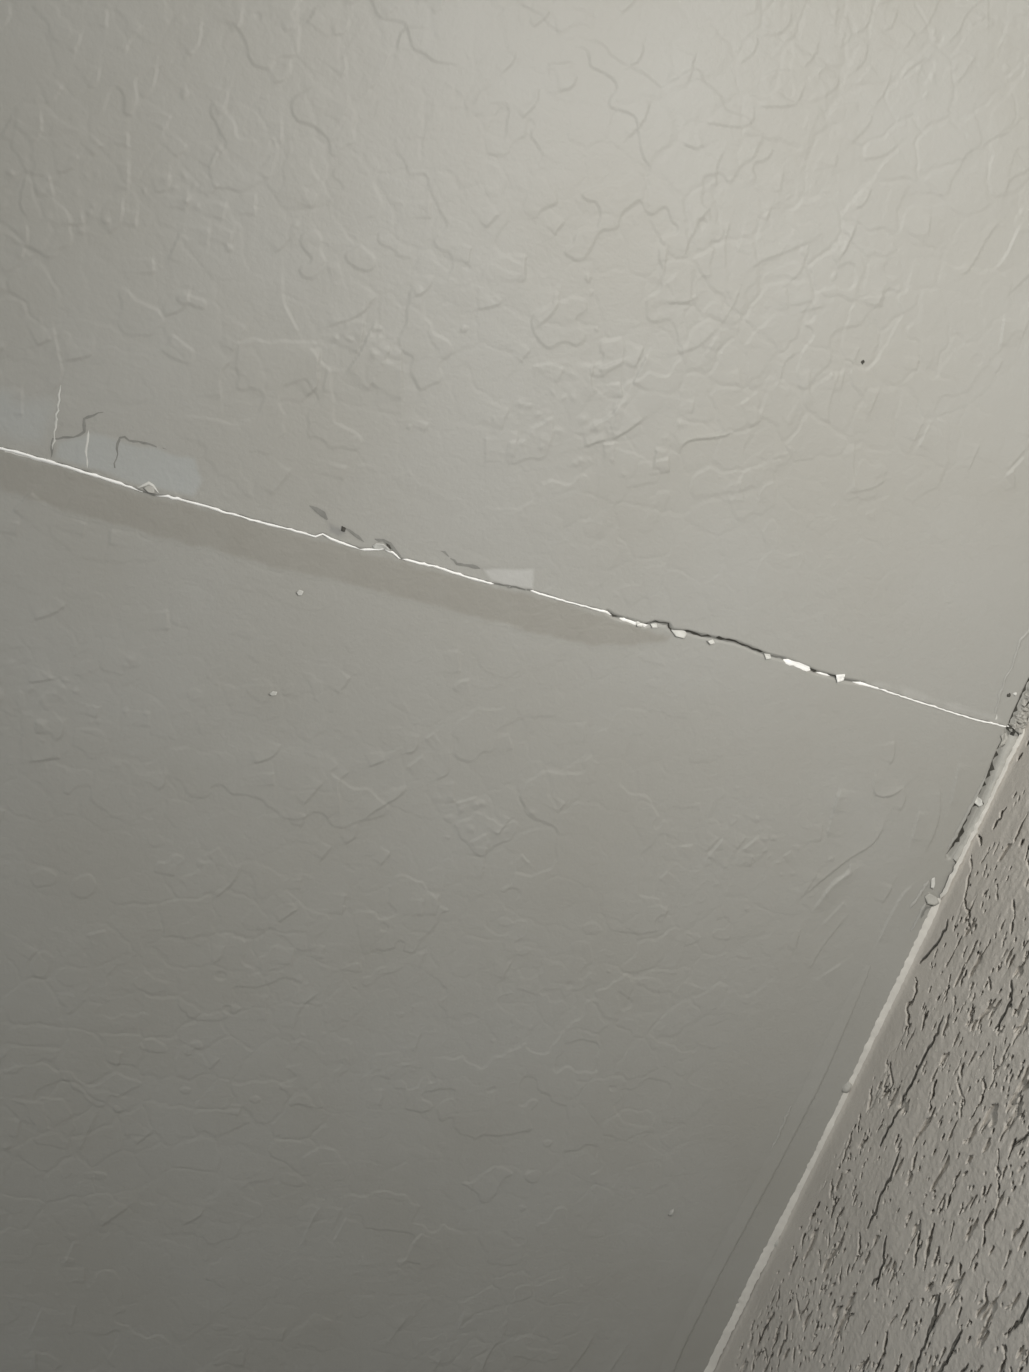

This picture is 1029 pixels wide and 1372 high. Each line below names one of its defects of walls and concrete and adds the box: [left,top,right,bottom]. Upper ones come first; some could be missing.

crack [0,385,1019,862]